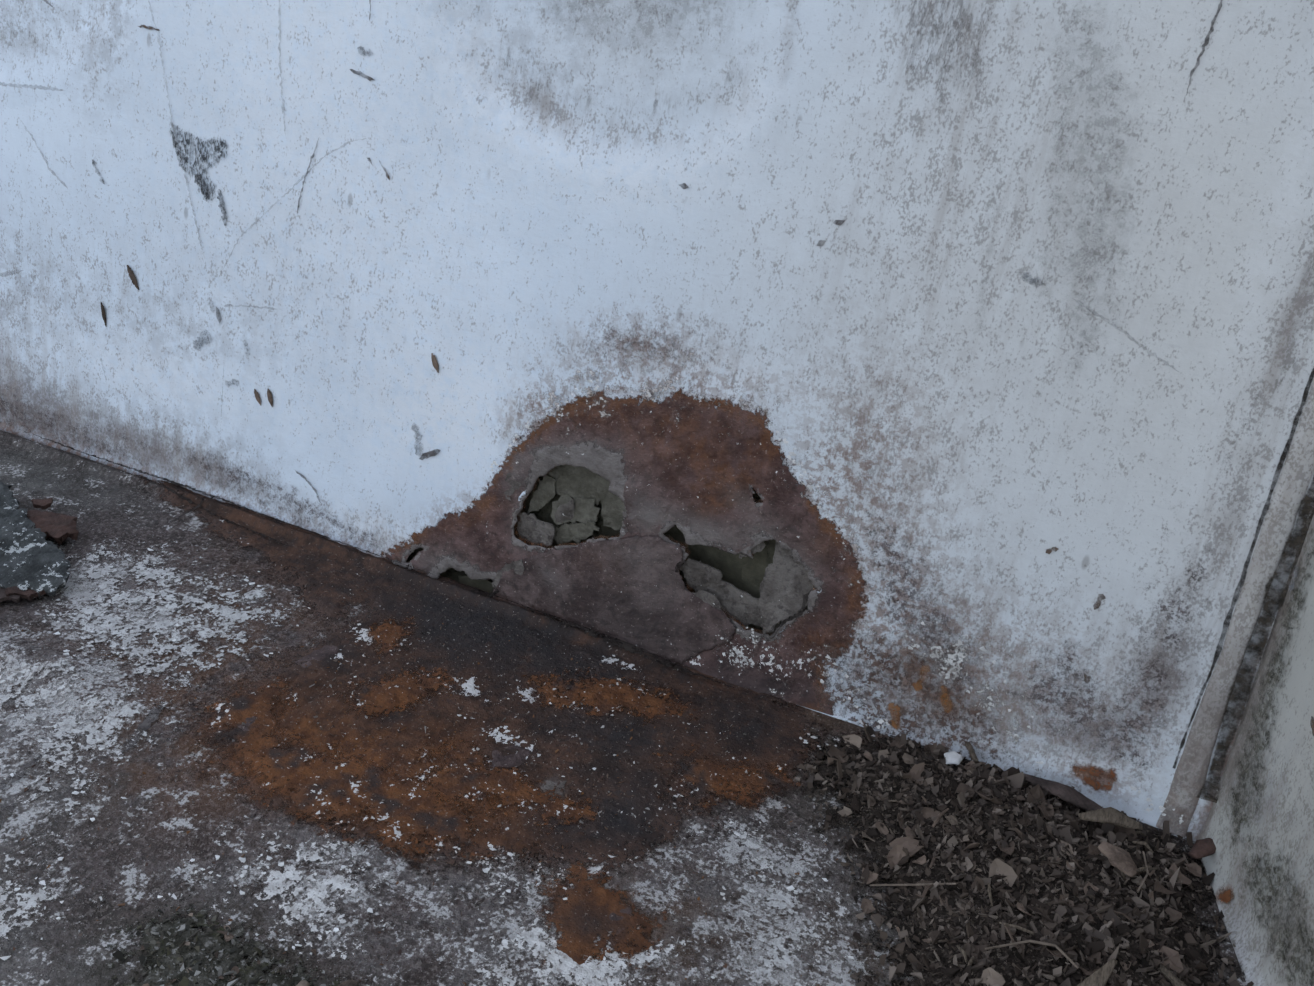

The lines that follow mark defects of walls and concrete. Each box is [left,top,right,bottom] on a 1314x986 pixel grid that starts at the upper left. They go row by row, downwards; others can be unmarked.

peeling [517,465,626,547]
peeling [680,541,813,667]
peeling [0,539,310,943]
rust [137,387,900,977]
peeling [820,645,890,737]
rust [1073,766,1117,792]
mould [1231,531,1314,986]
peeling [177,815,395,960]